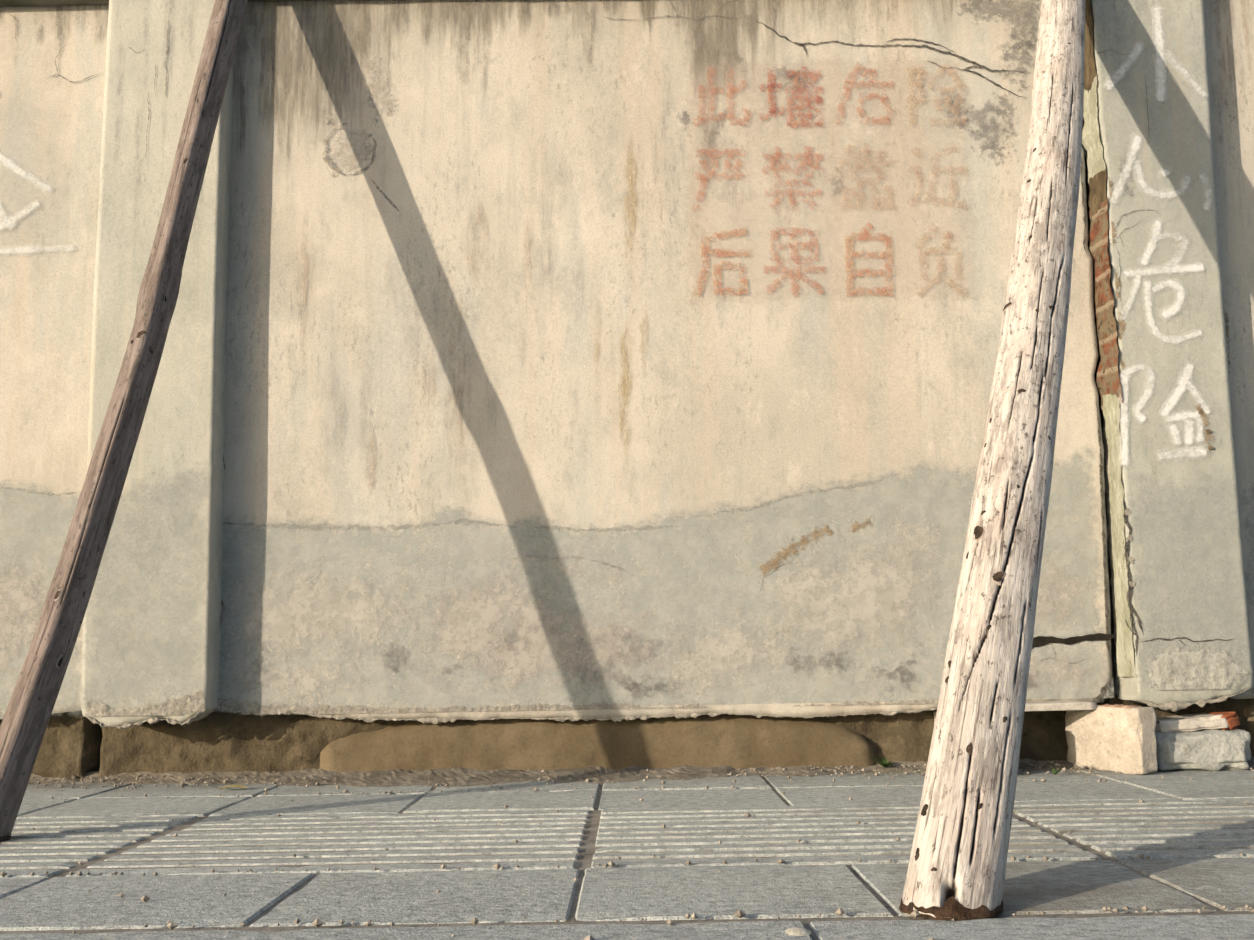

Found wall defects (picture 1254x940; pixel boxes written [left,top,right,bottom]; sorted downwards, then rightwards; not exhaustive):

water stain [244,0,370,114]
crack [605,1,1026,98]
water stain [962,0,1037,81]
water stain [943,97,1013,156]
crack [1032,125,1238,703]
water stain [0,484,79,712]
water stain [219,466,975,709]
corrosion [760,525,833,574]
water stain [1026,455,1109,699]